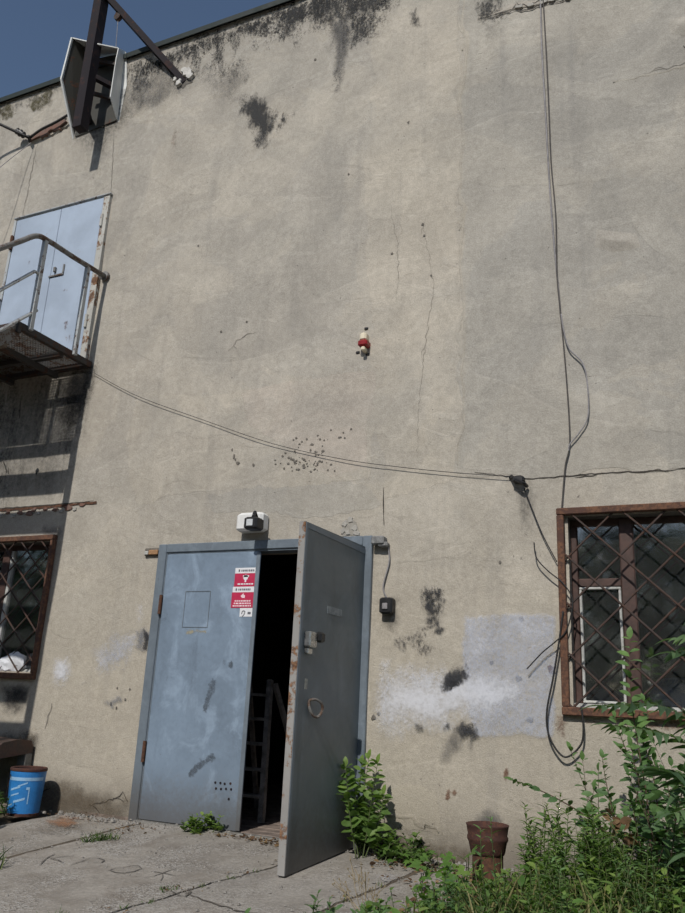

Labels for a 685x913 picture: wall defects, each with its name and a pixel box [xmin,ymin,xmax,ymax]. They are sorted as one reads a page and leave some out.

crack [483,0,564,20]
water stain [131,0,390,92]
water stain [240,96,285,147]
spalling [0,501,96,518]
water stain [423,592,444,634]
water stain [443,664,468,691]
water stain [450,722,478,746]